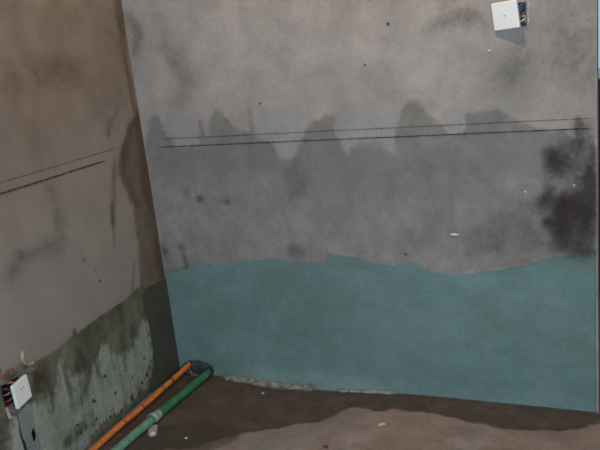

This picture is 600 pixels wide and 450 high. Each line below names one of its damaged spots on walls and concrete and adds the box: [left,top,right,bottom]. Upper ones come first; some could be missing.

damp [121,109,153,228]
damp [541,157,597,255]
damp [18,244,600,450]
damp [0,389,14,450]